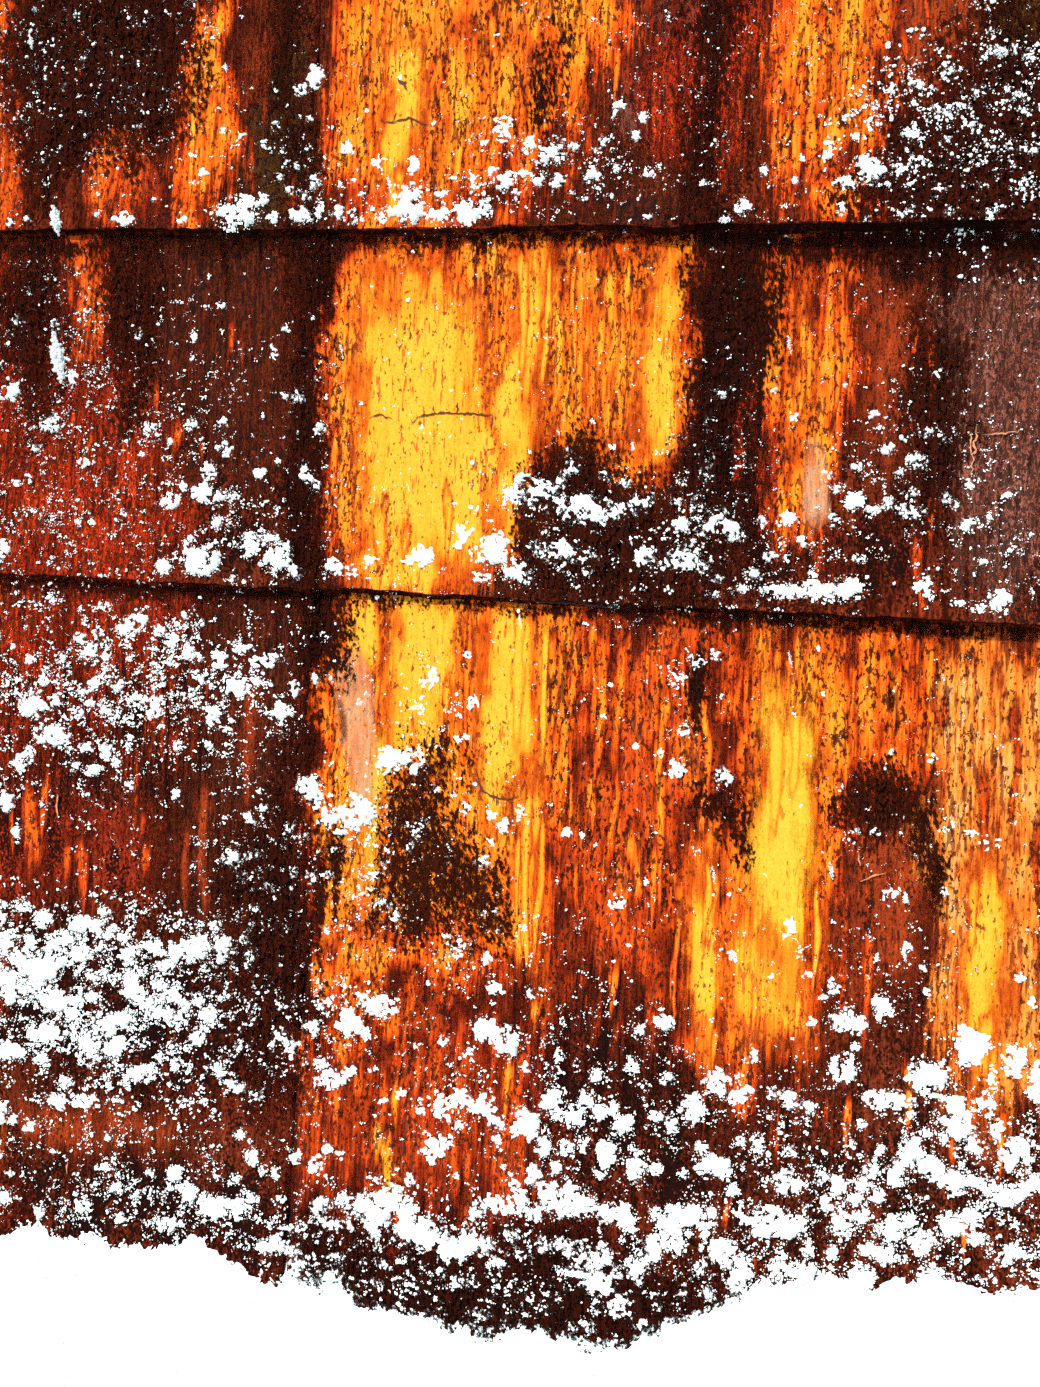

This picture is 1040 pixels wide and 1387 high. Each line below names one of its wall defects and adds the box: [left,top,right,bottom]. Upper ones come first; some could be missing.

corrosion [0,0,297,230]
corrosion [281,177,308,227]
corrosion [293,0,1040,229]
corrosion [0,232,1040,1285]